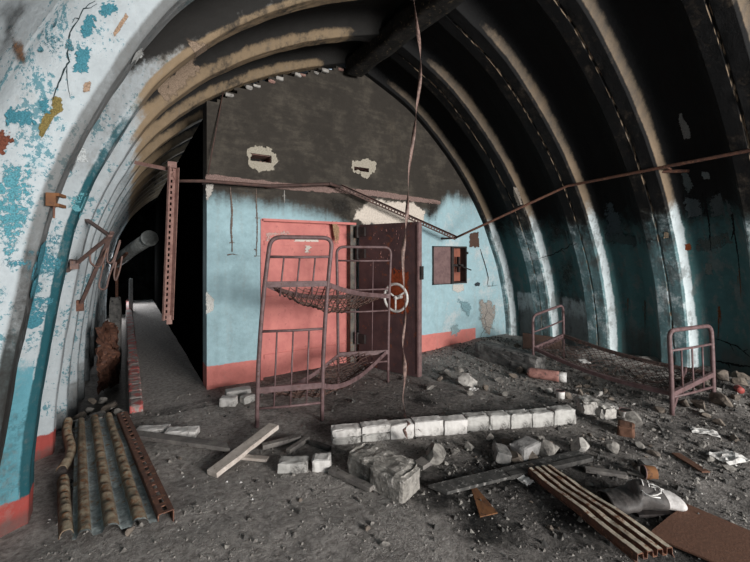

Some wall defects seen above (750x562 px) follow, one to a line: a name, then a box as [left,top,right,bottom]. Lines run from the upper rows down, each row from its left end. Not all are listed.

crack [53,1,96,100]
peeling [37,1,128,92]
flaking render [158,41,208,101]
peeling [71,148,89,172]
flaking render [247,145,278,172]
flaking render [351,158,377,179]
peeling [0,96,63,329]
peeling [68,192,89,219]
flaking render [354,190,431,239]
corrosion [390,268,409,315]
flaking render [479,299,496,335]